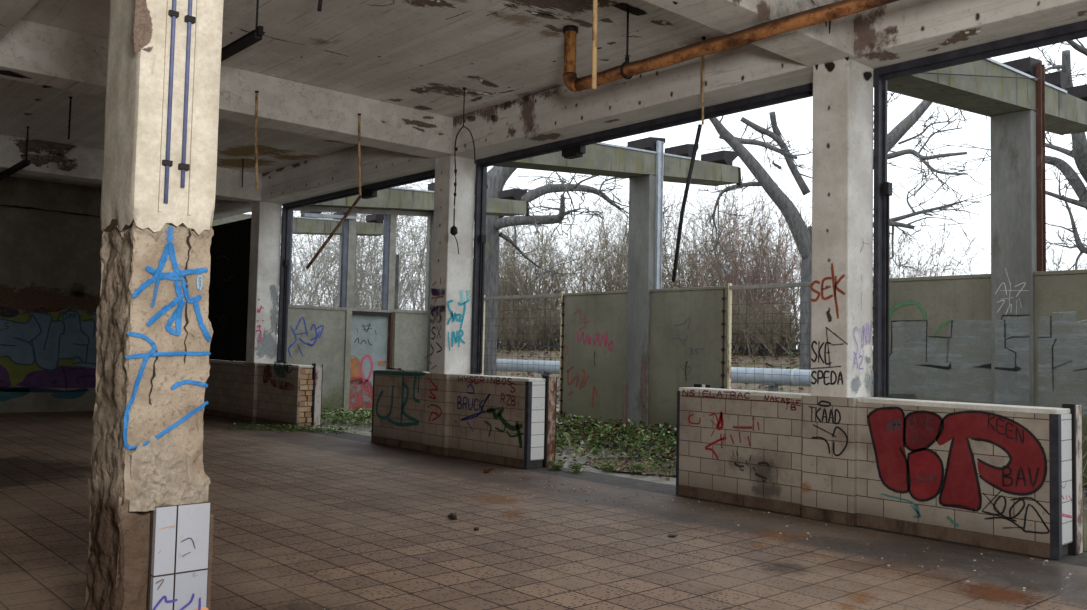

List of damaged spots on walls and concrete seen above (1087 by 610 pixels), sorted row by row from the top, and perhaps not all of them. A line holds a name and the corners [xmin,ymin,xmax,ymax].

leakage [757,1,770,21]
spalling [84,221,214,610]